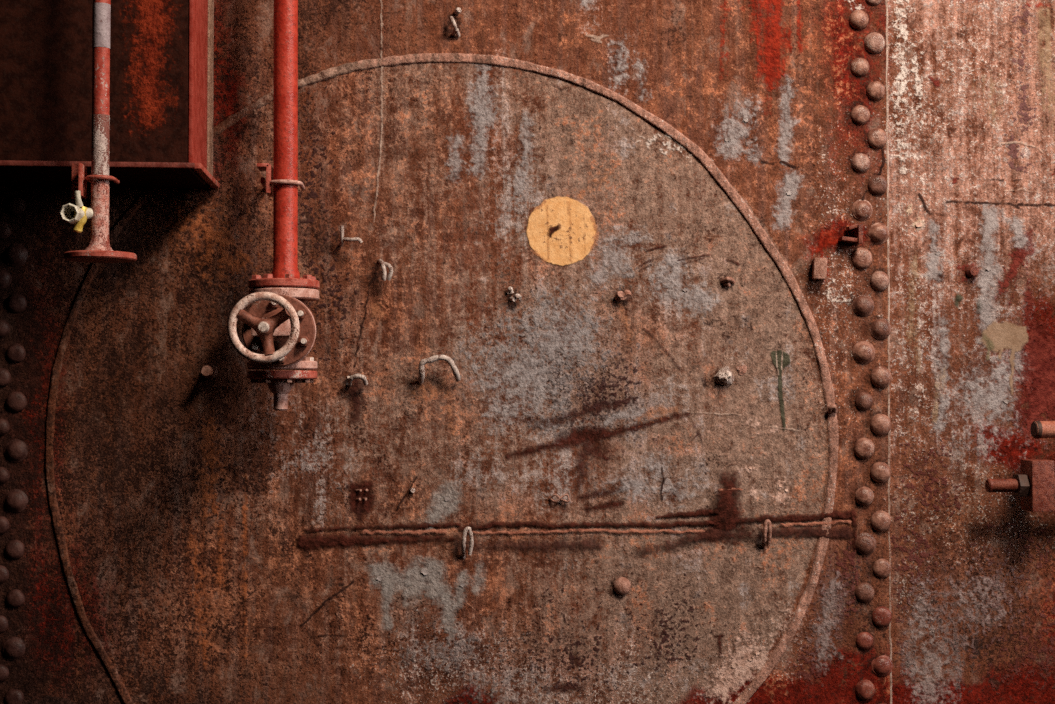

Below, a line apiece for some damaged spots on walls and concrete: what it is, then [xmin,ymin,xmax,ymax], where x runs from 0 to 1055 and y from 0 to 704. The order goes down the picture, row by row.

corrosion [124,0,177,126]
corrosion [298,64,367,378]
peeling [717,100,762,161]
peeling [774,78,804,229]
peeling [891,0,926,174]
peeling [974,204,1028,343]
corrosion [419,286,689,510]
peeling [933,319,1024,440]
corrosion [348,480,376,522]
peeling [370,558,483,638]
corrosion [392,573,733,704]
corrosion [881,430,1055,703]